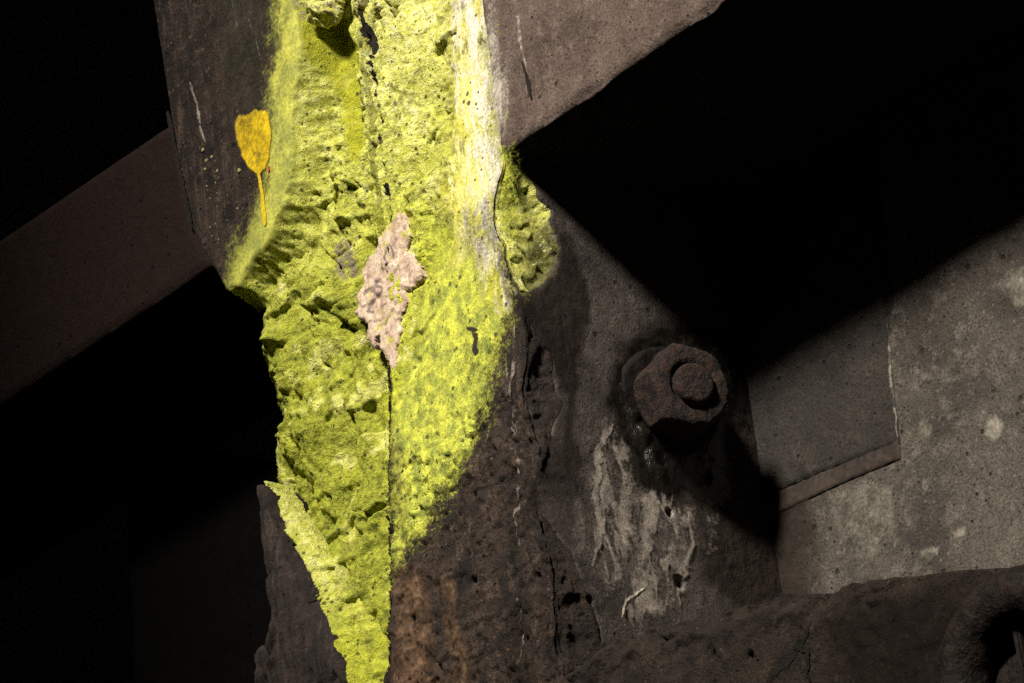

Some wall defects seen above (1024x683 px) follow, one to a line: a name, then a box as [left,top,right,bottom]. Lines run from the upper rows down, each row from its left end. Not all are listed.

spalling [228,0,457,682]
crack [385,361,395,683]
efflorescence [588,423,695,625]